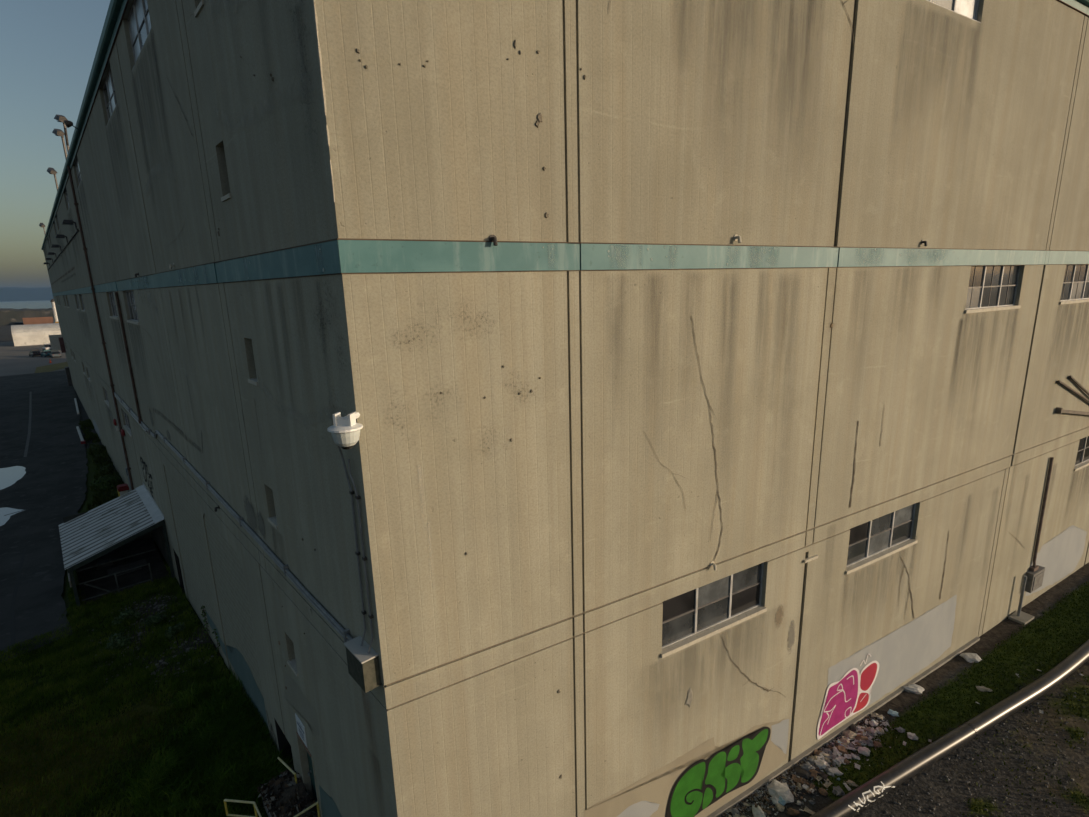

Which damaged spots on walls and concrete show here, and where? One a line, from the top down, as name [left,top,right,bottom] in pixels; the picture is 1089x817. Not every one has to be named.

crack [691,316,723,561]
crack [721,636,783,695]